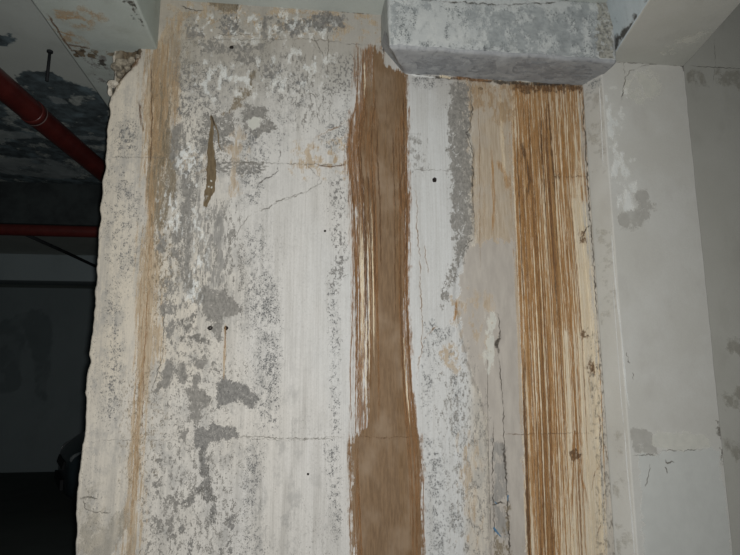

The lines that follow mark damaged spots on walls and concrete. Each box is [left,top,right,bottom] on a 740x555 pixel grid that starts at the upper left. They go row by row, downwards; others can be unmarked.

corrosion [115,15,182,555]
peeling [0,2,360,555]
damp [176,116,246,207]
corrosion [319,45,425,555]
corrosion [510,81,607,555]